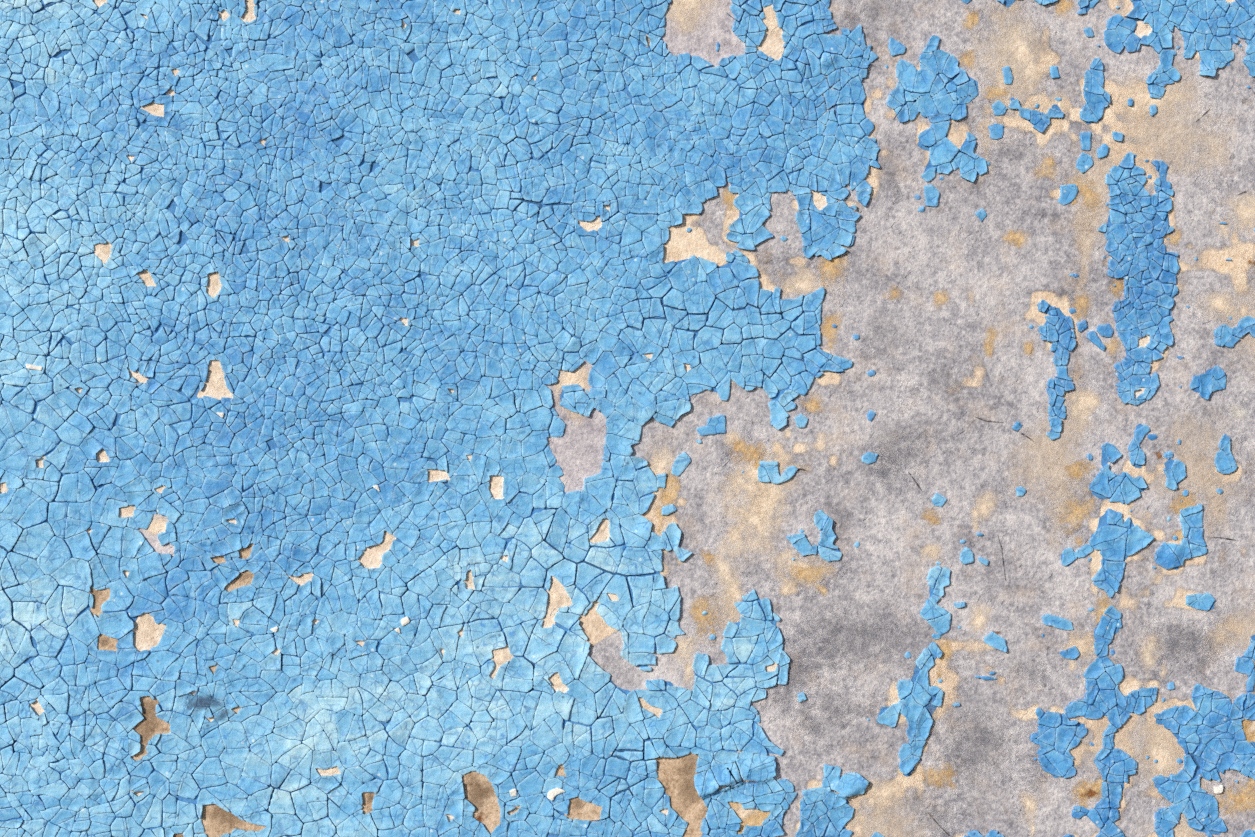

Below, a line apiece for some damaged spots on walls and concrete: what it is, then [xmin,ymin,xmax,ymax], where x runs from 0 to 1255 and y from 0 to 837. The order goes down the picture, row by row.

crack [1112,0,1255,94]
crack [895,51,979,176]
crack [0,0,878,837]
crack [976,307,1072,441]
peeling [1061,525,1128,598]
crack [1035,155,1255,837]
peeling [1167,504,1207,566]
crack [877,650,938,777]
peeling [1030,707,1094,760]
peeling [1077,684,1130,736]
peeling [1104,664,1158,715]
peeling [1072,711,1255,837]